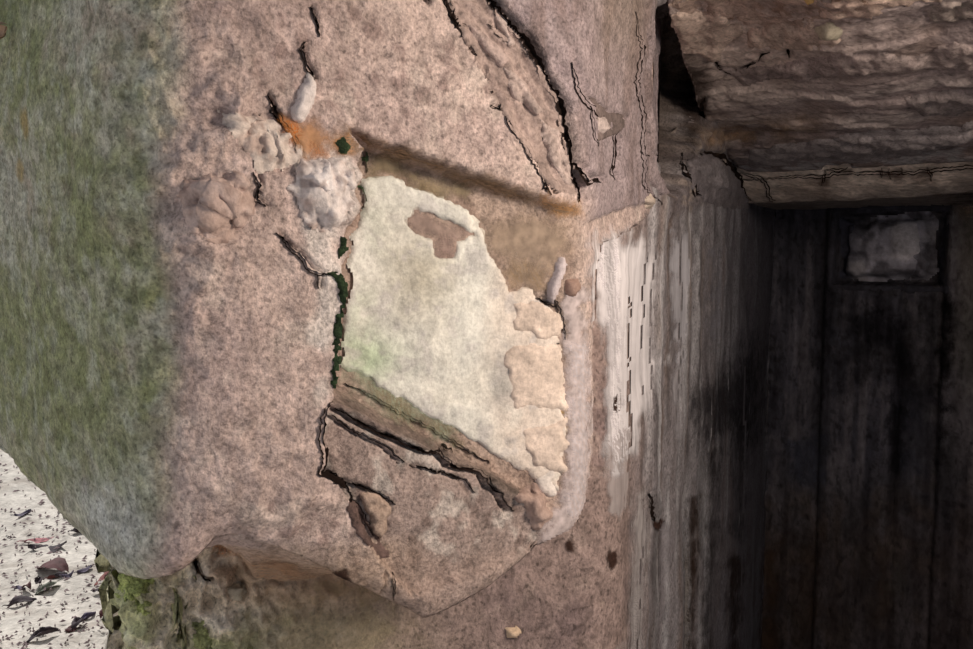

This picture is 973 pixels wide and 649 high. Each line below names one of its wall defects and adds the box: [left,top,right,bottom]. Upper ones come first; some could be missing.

crack [428,0,489,70]
crack [487,0,663,205]
crack [715,49,790,75]
corrosion [283,121,577,214]
crack [680,151,973,202]
flaking render [339,176,690,541]
crack [318,383,513,537]
spalling [346,489,391,559]